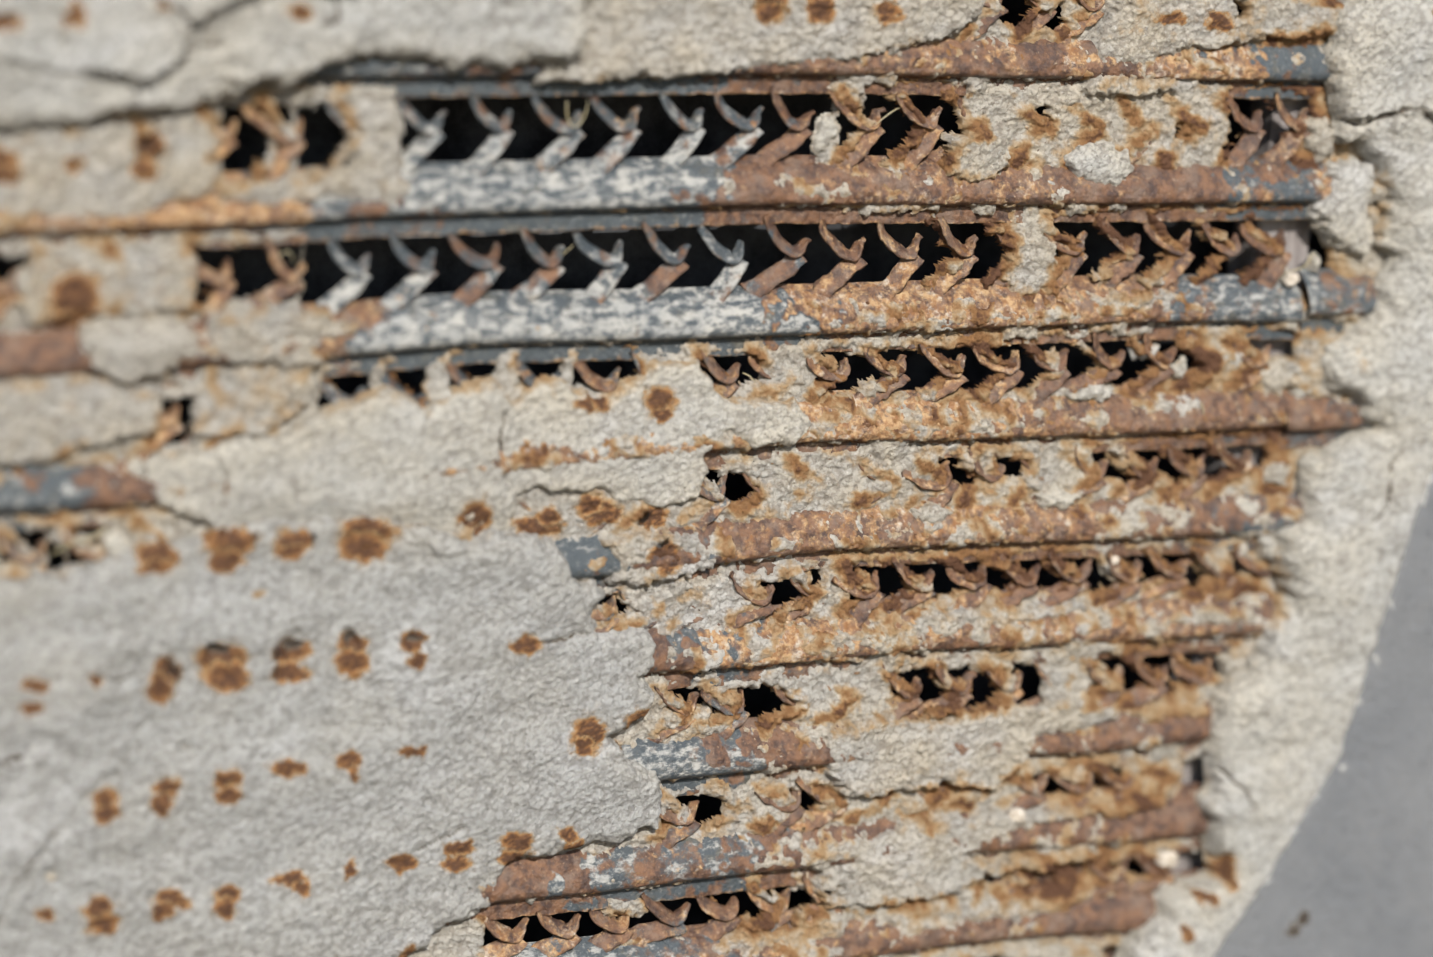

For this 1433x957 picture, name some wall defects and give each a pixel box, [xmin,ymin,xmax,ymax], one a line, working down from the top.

rust [753,0,836,25]
spalling [0,78,412,222]
spalling [530,0,1344,292]
spalling [1212,79,1388,286]
rust [200,525,313,574]
rust [336,517,402,565]
rust [456,492,683,578]
spalling [0,187,1363,957]
rust [145,642,252,707]
rust [332,629,370,680]
crack [0,755,24,772]
rust [569,708,650,757]